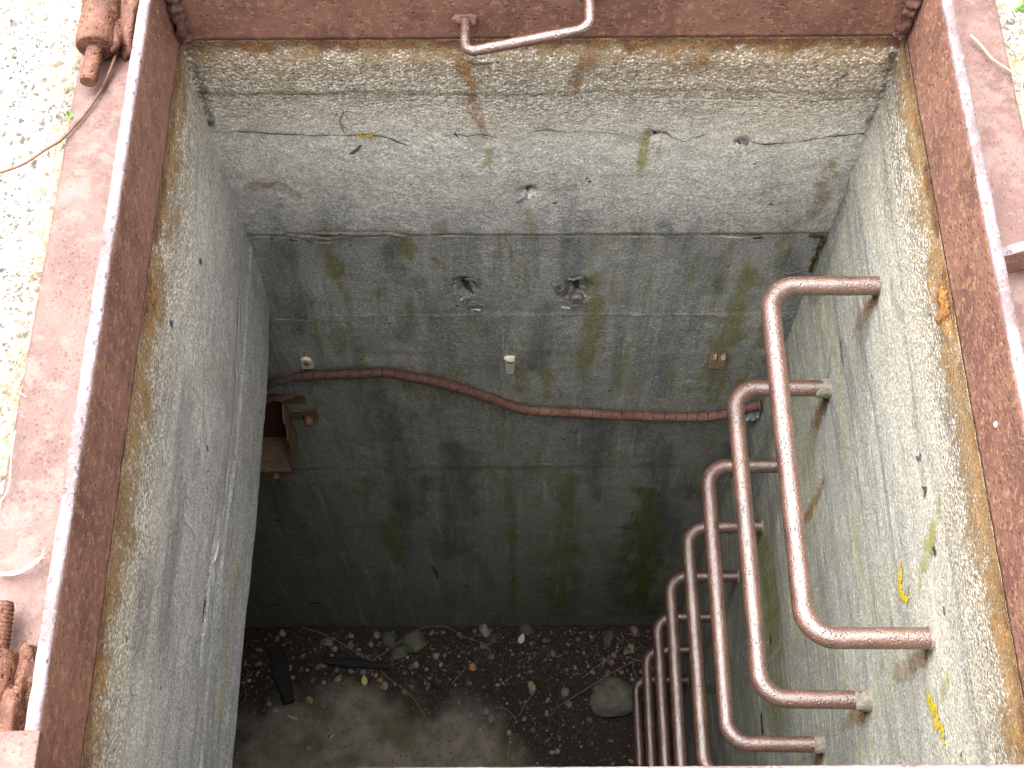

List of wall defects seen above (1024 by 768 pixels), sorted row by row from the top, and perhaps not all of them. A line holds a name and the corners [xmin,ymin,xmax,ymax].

crack [210,93,409,146]
crack [443,131,493,139]
crack [734,133,865,145]
spalling [453,278,487,311]
spalling [550,276,590,310]
corrosion [82,40,500,768]
corrosion [525,37,1024,762]